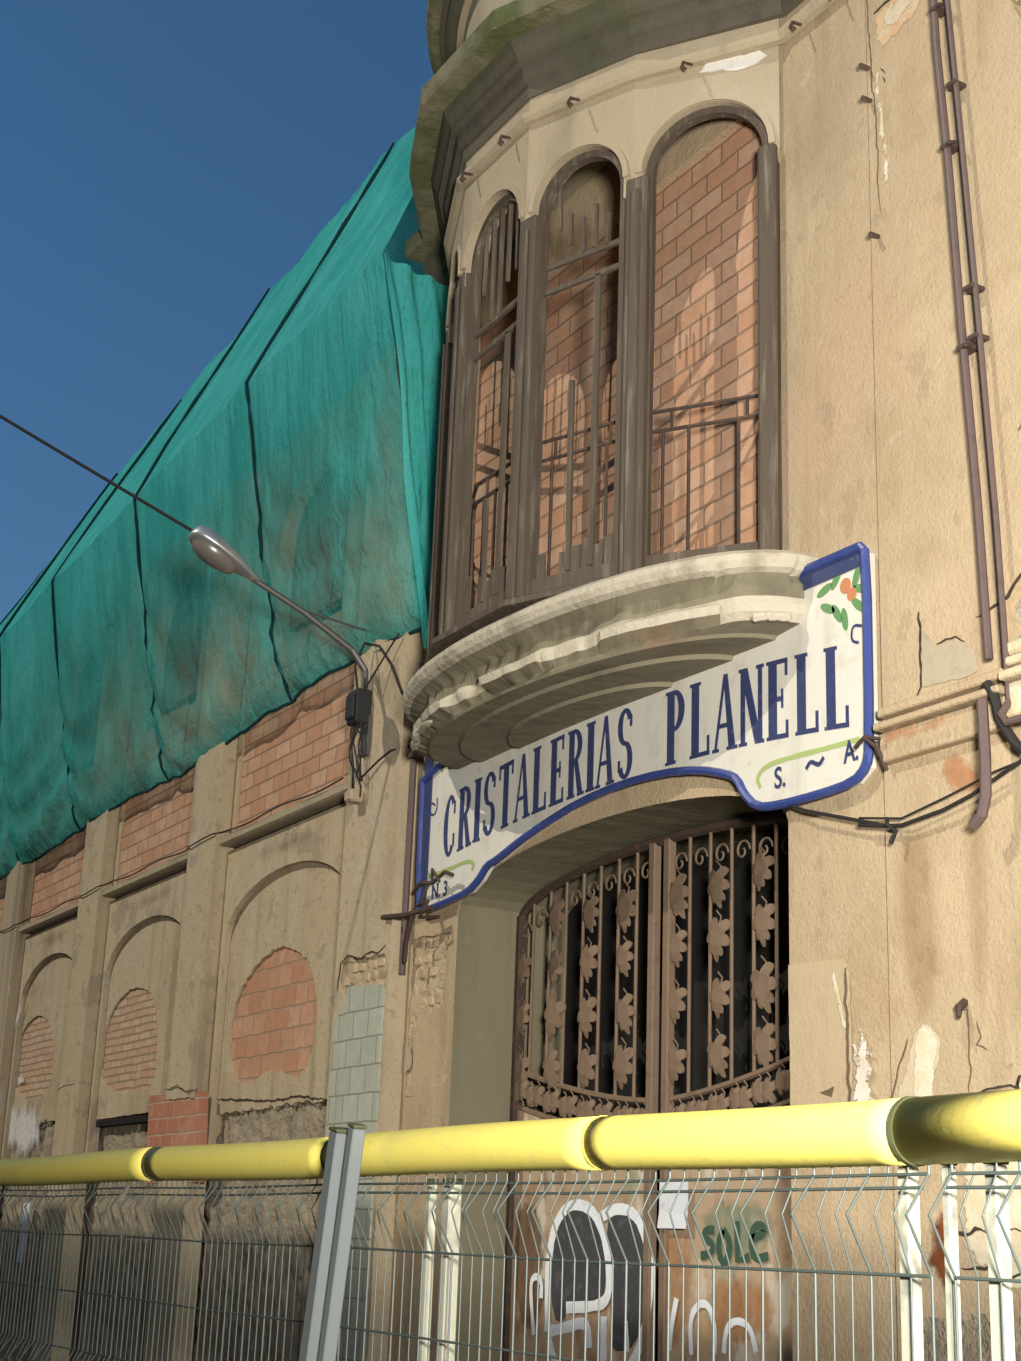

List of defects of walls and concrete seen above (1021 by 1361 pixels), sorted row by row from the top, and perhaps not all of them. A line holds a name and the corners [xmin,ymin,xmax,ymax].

flaking render [874,0,919,48]
flaking render [891,1024,941,1099]
water stain [7,1107,39,1153]
flaking render [963,1163,988,1266]
flaking render [1006,1162,1021,1288]